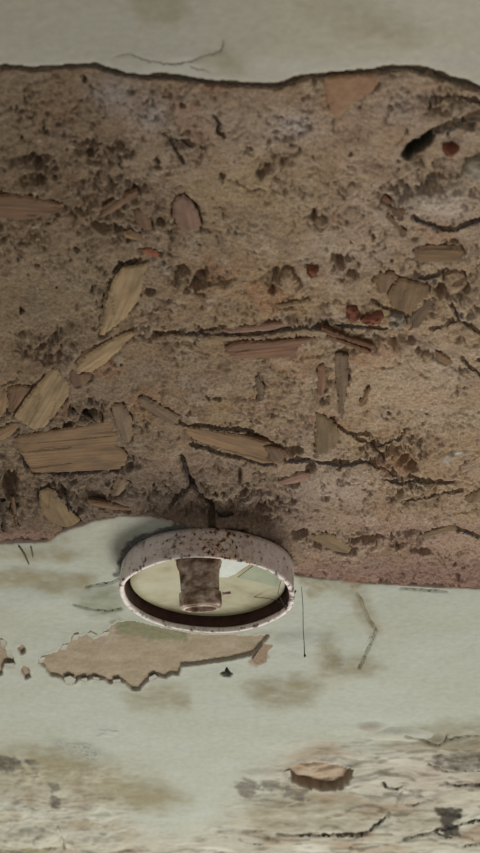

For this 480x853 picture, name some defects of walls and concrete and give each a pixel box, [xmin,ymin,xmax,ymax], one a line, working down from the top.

crack [3,41,480,111]
spalling [0,62,480,588]
crack [170,422,462,518]
peeling [38,621,273,687]
leakage [236,779,307,801]
spalling [284,762,361,782]
crack [251,781,419,850]
crack [406,819,480,848]
leakage [435,808,462,837]